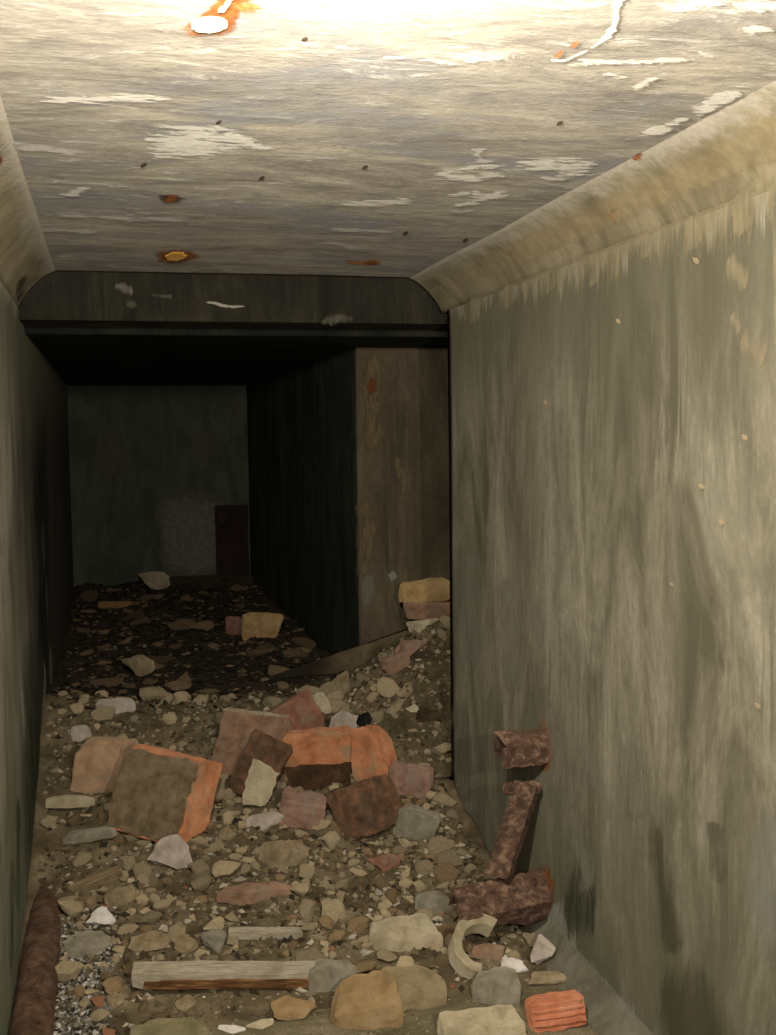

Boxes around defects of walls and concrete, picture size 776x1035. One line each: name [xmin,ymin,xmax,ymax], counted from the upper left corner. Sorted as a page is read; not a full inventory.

rust [183,0,261,35]
rust [156,249,199,262]